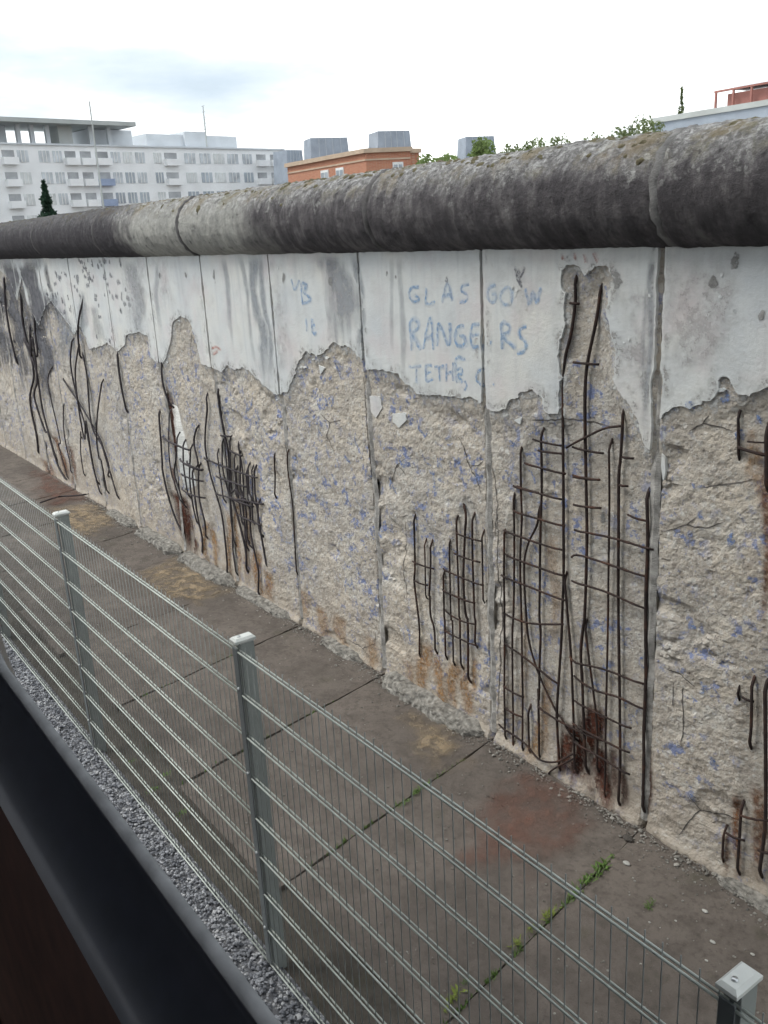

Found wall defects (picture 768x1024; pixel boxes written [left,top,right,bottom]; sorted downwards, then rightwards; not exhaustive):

leakage [0,265,71,399]
leakage [250,265,267,352]
corrosion [172,469,273,595]
spalling [0,248,768,897]
corrosion [417,648,475,711]
corrosion [560,706,627,807]